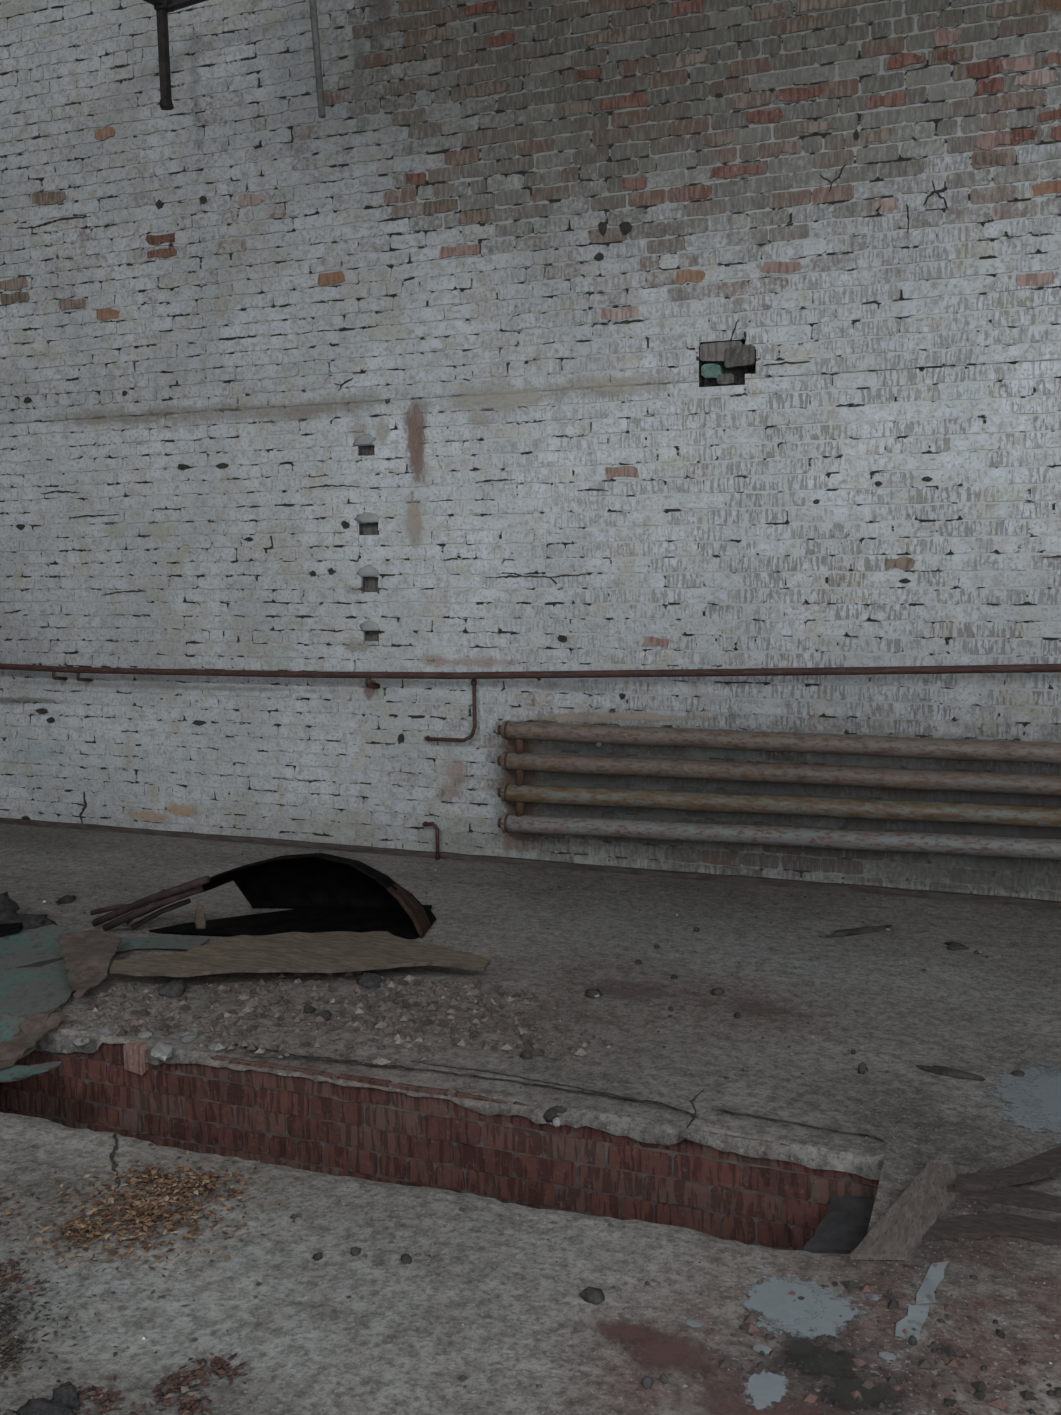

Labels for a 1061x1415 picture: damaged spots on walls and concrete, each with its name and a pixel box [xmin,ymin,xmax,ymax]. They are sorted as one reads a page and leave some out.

peeling [887,28,1061,96]
peeling [702,83,823,147]
peeling [970,109,1061,166]
peeling [405,172,490,224]
flaking render [1032,180,1061,197]
flaking render [146,233,177,258]
spalling [593,221,633,261]
flaking render [0,276,30,305]
flaking render [58,298,120,321]
rust [406,403,424,479]
crack [109,1130,121,1192]
spalling [0,1042,879,1251]